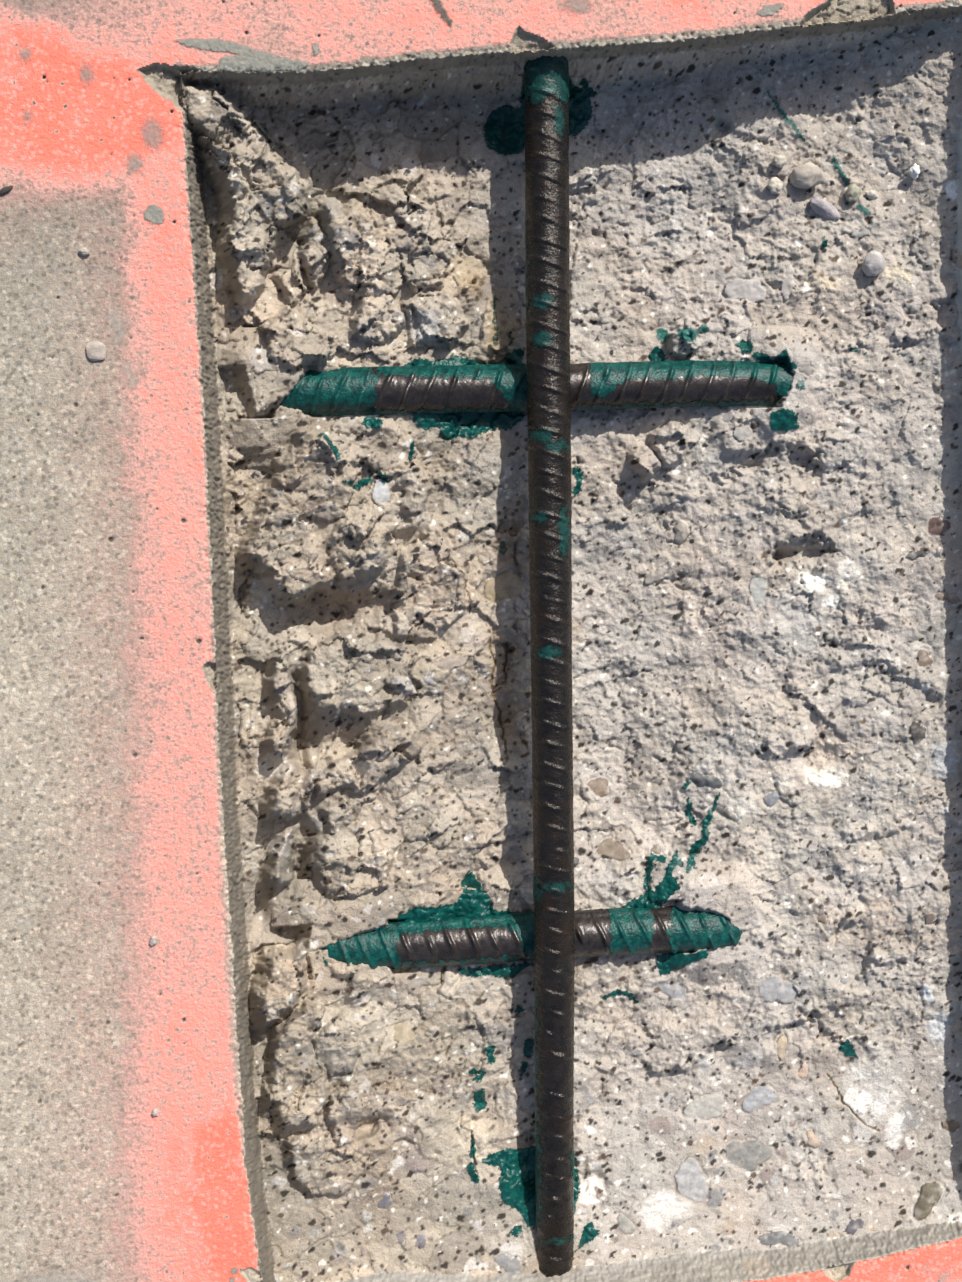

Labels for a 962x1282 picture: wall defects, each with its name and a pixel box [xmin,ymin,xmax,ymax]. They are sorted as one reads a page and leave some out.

peeling [757,3,784,16]
spalling [796,0,896,28]
spalling [173,6,962,88]
spalling [138,64,214,112]
peeling [143,205,165,224]
spalling [180,62,540,1282]
spalling [348,14,962,1282]